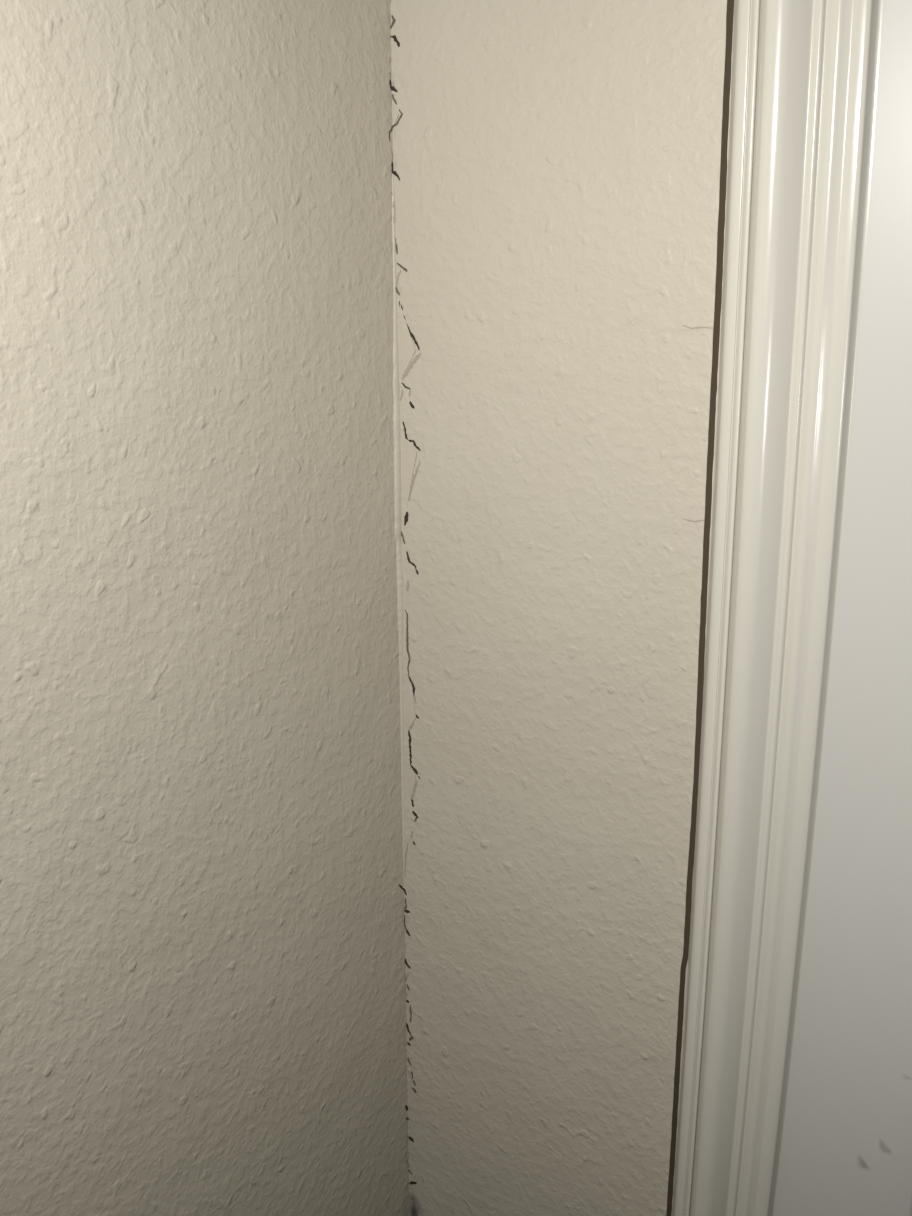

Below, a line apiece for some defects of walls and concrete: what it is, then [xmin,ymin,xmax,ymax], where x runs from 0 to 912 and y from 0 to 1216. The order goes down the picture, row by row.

crack [389,0,421,1185]